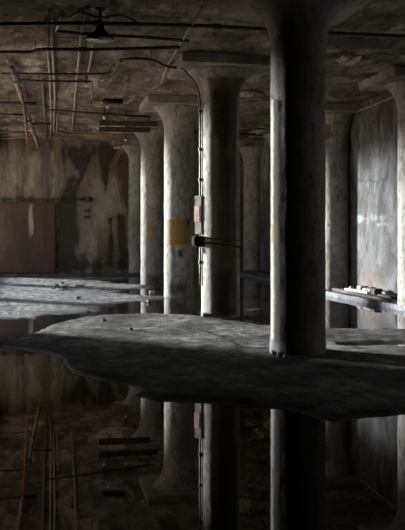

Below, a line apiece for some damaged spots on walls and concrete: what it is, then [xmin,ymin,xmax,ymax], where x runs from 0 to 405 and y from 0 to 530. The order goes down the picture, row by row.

damp [17,145,129,273]